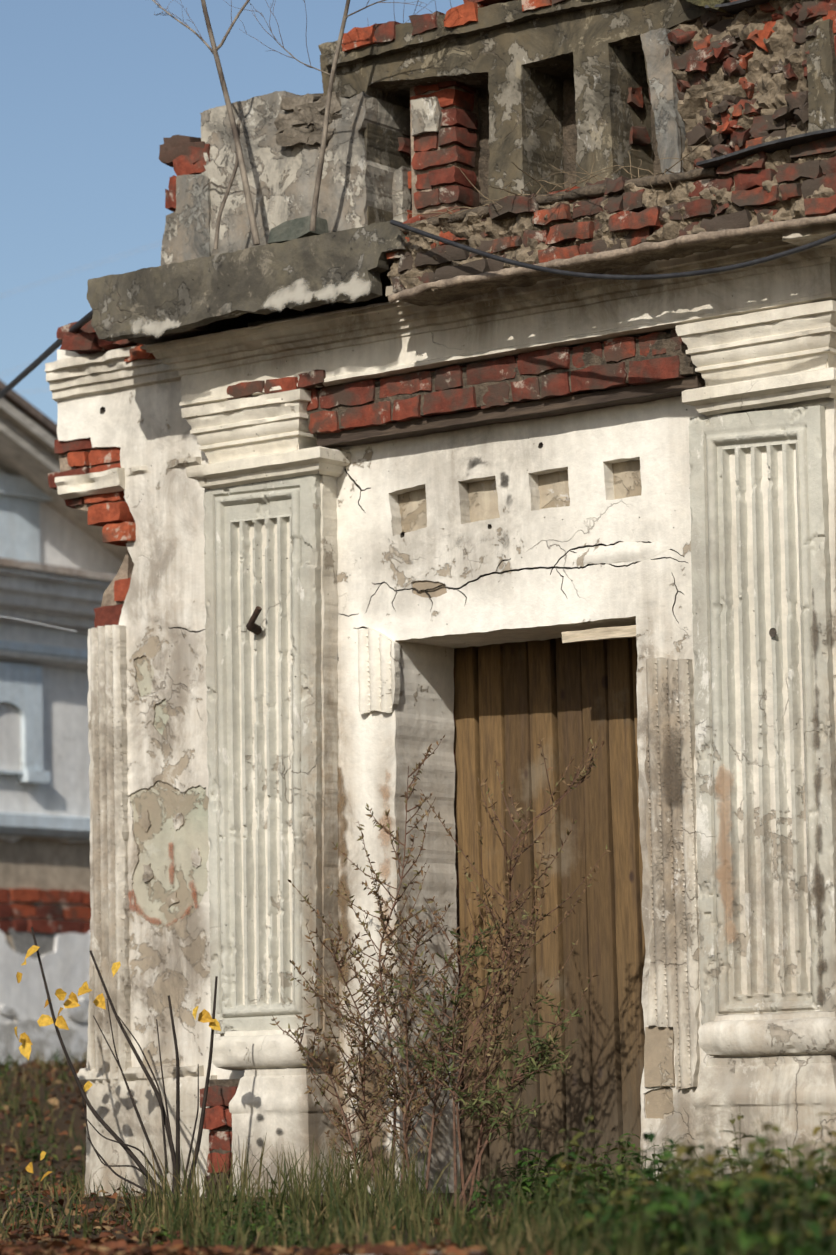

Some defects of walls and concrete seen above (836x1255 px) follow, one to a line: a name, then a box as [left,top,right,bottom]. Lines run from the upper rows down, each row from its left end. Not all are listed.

spalling [159,135,210,212]
crack [339,541,688,629]
spalling [0,837,91,959]
peeling [130,781,210,927]
peeling [0,997,88,1069]